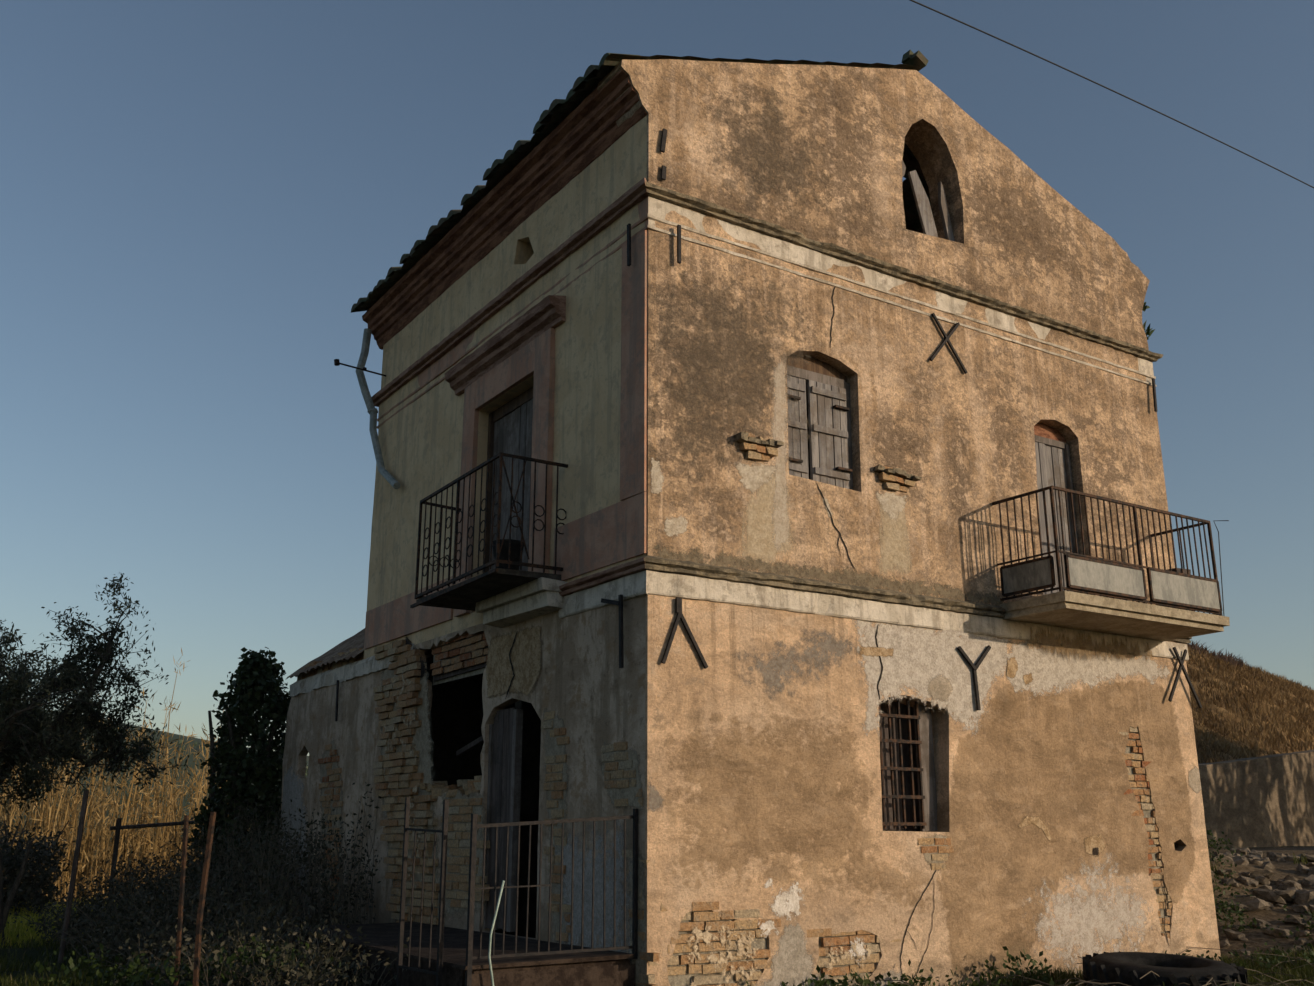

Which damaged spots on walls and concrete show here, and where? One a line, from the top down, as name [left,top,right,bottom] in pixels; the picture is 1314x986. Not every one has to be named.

crack [829,286,837,348]
flaking render [734,432,778,494]
crack [817,484,854,567]
flaking render [876,466,915,519]
crack [875,624,883,700]
flaking render [373,637,440,925]
flaking render [318,740,343,920]
flaking render [1119,727,1178,939]
flaking render [622,849,805,986]
flaking render [806,928,901,983]